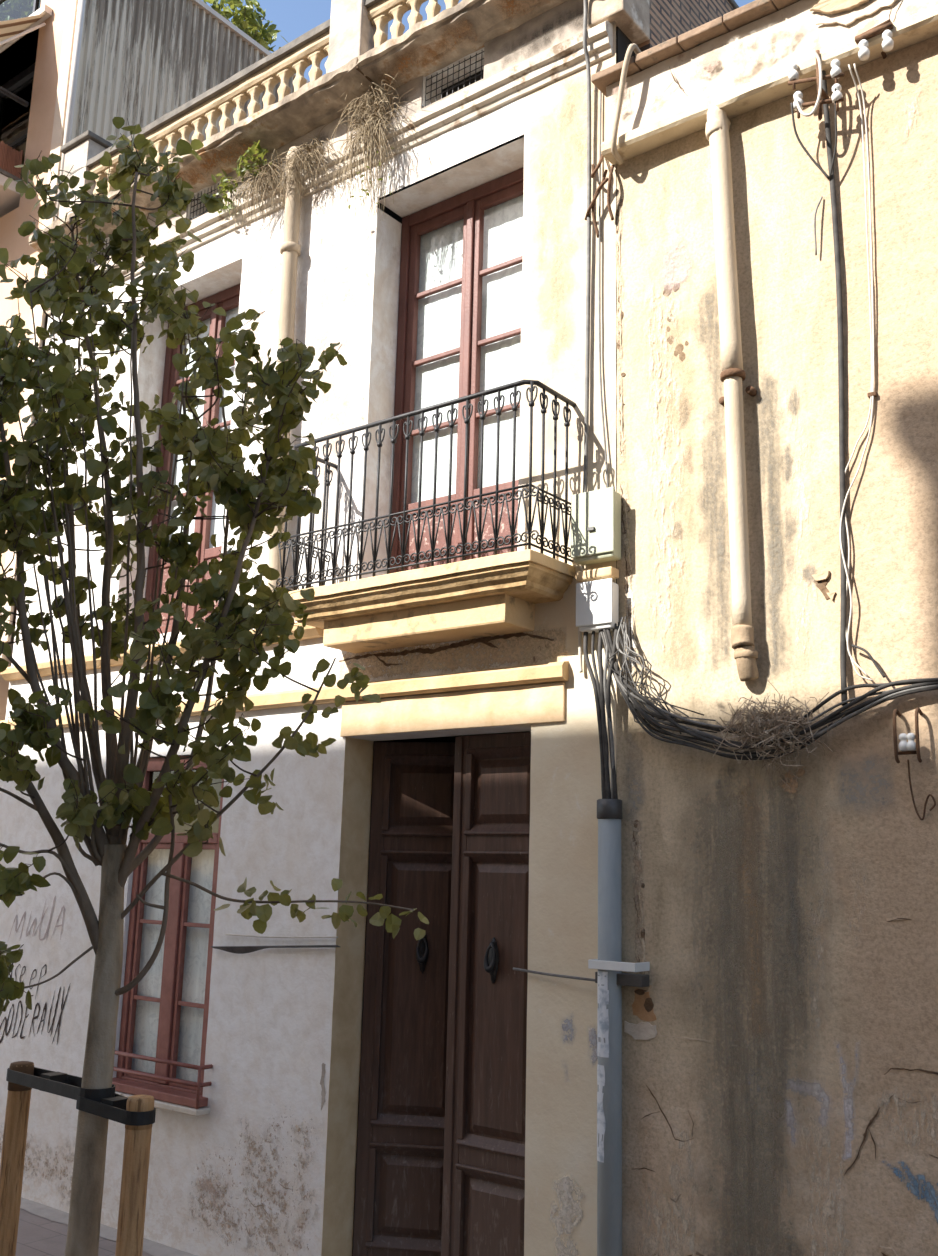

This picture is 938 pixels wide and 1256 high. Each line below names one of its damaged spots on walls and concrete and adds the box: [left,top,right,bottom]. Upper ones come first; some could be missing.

peeling [696,25,796,76]
peeling [810,0,896,26]
water stain [645,243,730,665]
water stain [760,377,817,671]
crack [339,632,554,667]
water stain [626,588,636,674]
spalling [631,820,657,1022]
water stain [638,770,853,1256]
crack [643,1081,694,1142]
crack [837,1078,894,1175]